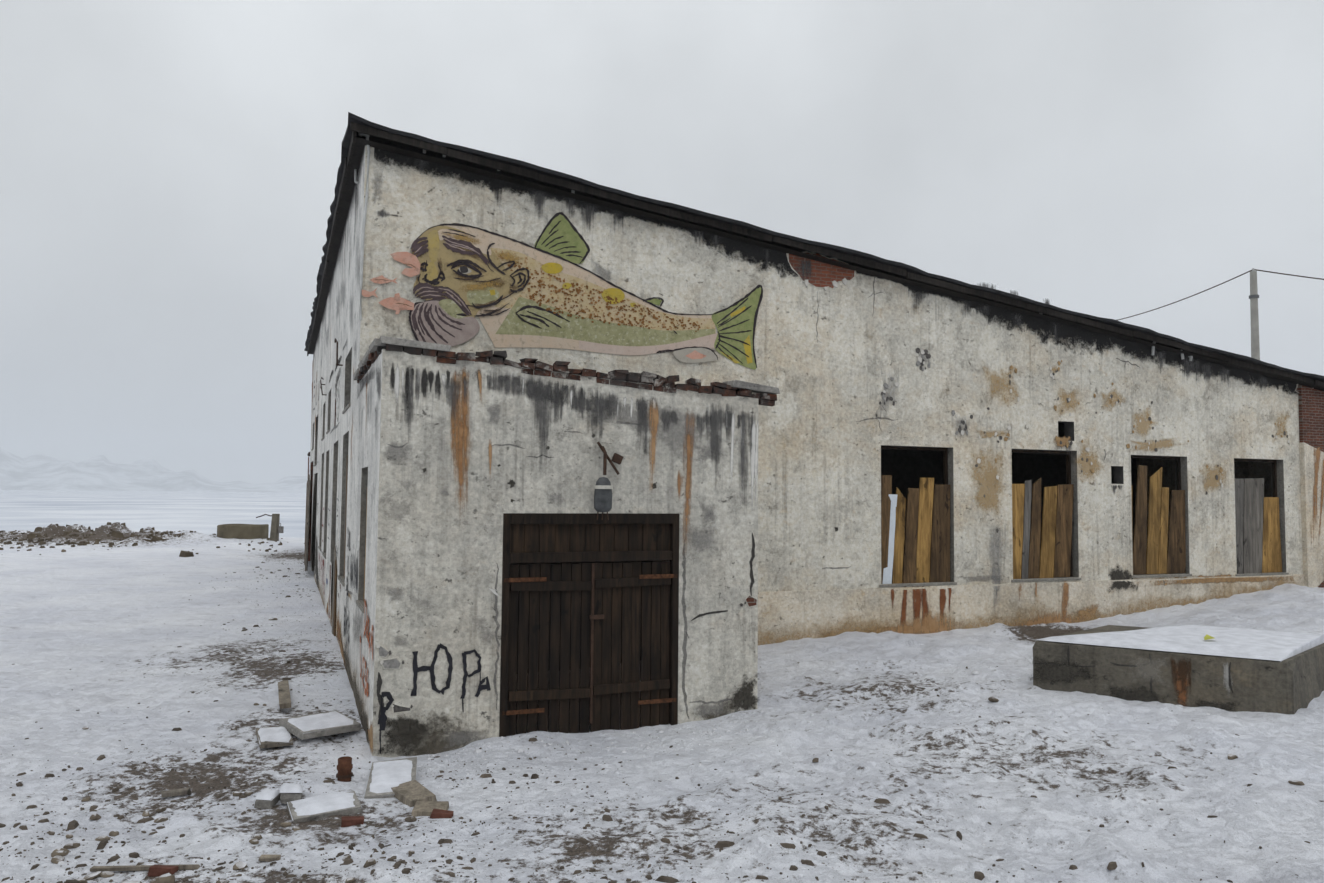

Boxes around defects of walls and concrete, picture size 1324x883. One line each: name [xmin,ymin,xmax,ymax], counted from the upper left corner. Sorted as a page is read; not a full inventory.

spalling [786,251,856,291]
corrosion [451,370,482,503]
damp [358,363,677,454]
corrosion [649,407,659,471]
corrosion [677,414,695,530]
damp [697,405,758,499]
peeling [952,410,1011,510]
peeling [986,365,1019,410]
corrosion [1313,447,1324,539]
corrosion [888,586,954,634]